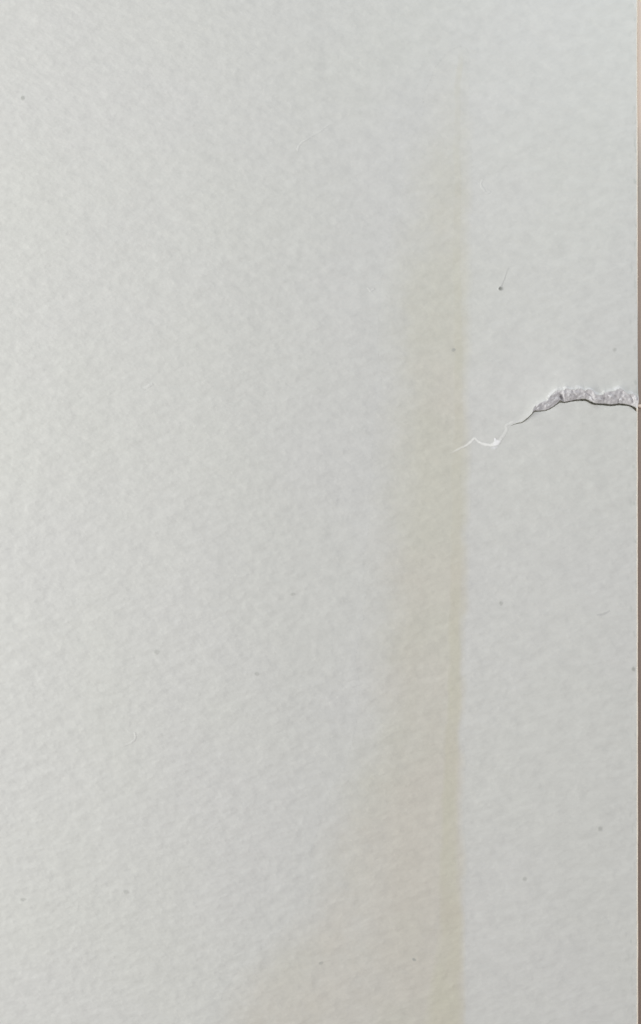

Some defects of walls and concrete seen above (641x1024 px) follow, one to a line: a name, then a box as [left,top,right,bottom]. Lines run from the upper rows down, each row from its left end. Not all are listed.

crack [450,385,639,455]